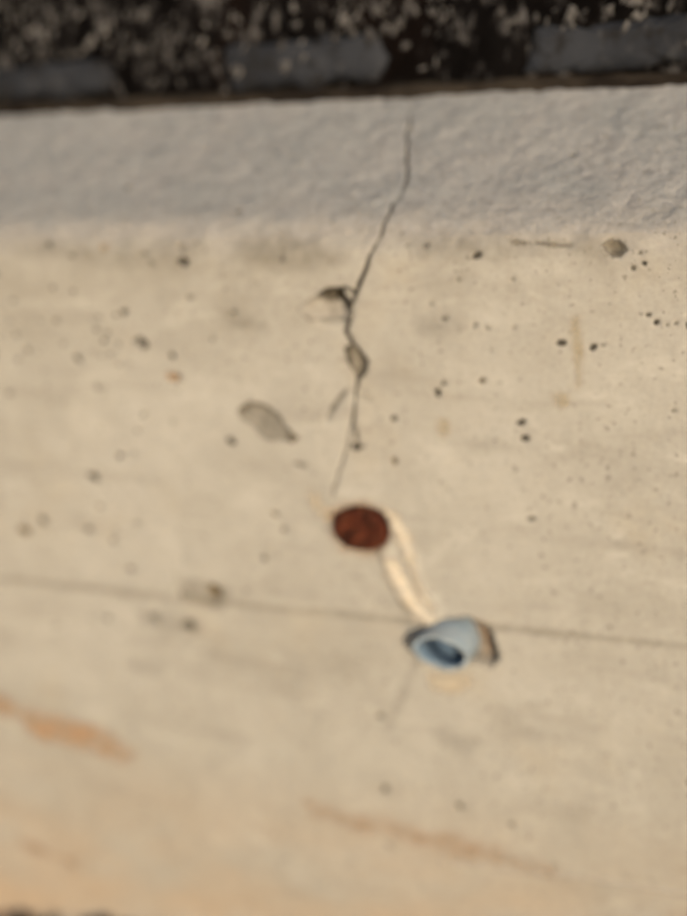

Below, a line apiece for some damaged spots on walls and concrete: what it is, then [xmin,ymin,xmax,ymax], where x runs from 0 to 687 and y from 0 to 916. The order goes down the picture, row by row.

crack [343,114,411,344]
spalling [298,287,353,321]
spalling [238,402,298,442]
crack [329,375,360,497]
corrosion [333,505,437,627]